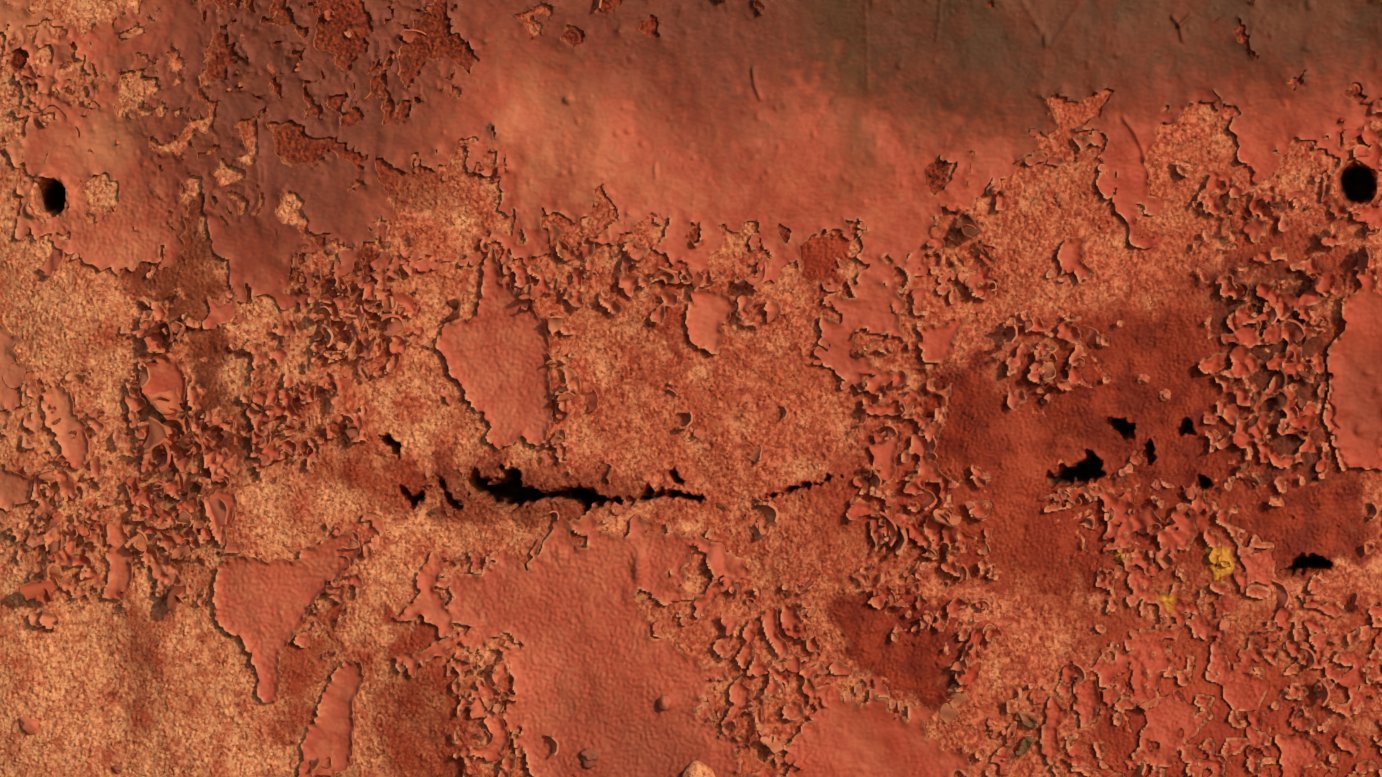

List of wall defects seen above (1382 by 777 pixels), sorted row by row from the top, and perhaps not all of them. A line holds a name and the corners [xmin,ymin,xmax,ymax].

spalling [260,0,373,74]
rust [786,233,850,293]
rust [125,194,255,491]
peeling [200,410,237,439]
rust [821,275,1377,595]
peeling [38,466,84,506]
crack [441,467,705,513]
crack [765,475,844,499]
peeling [1043,446,1144,555]
peeling [1268,476,1288,506]
rust [828,588,963,707]
rust [1086,619,1382,777]